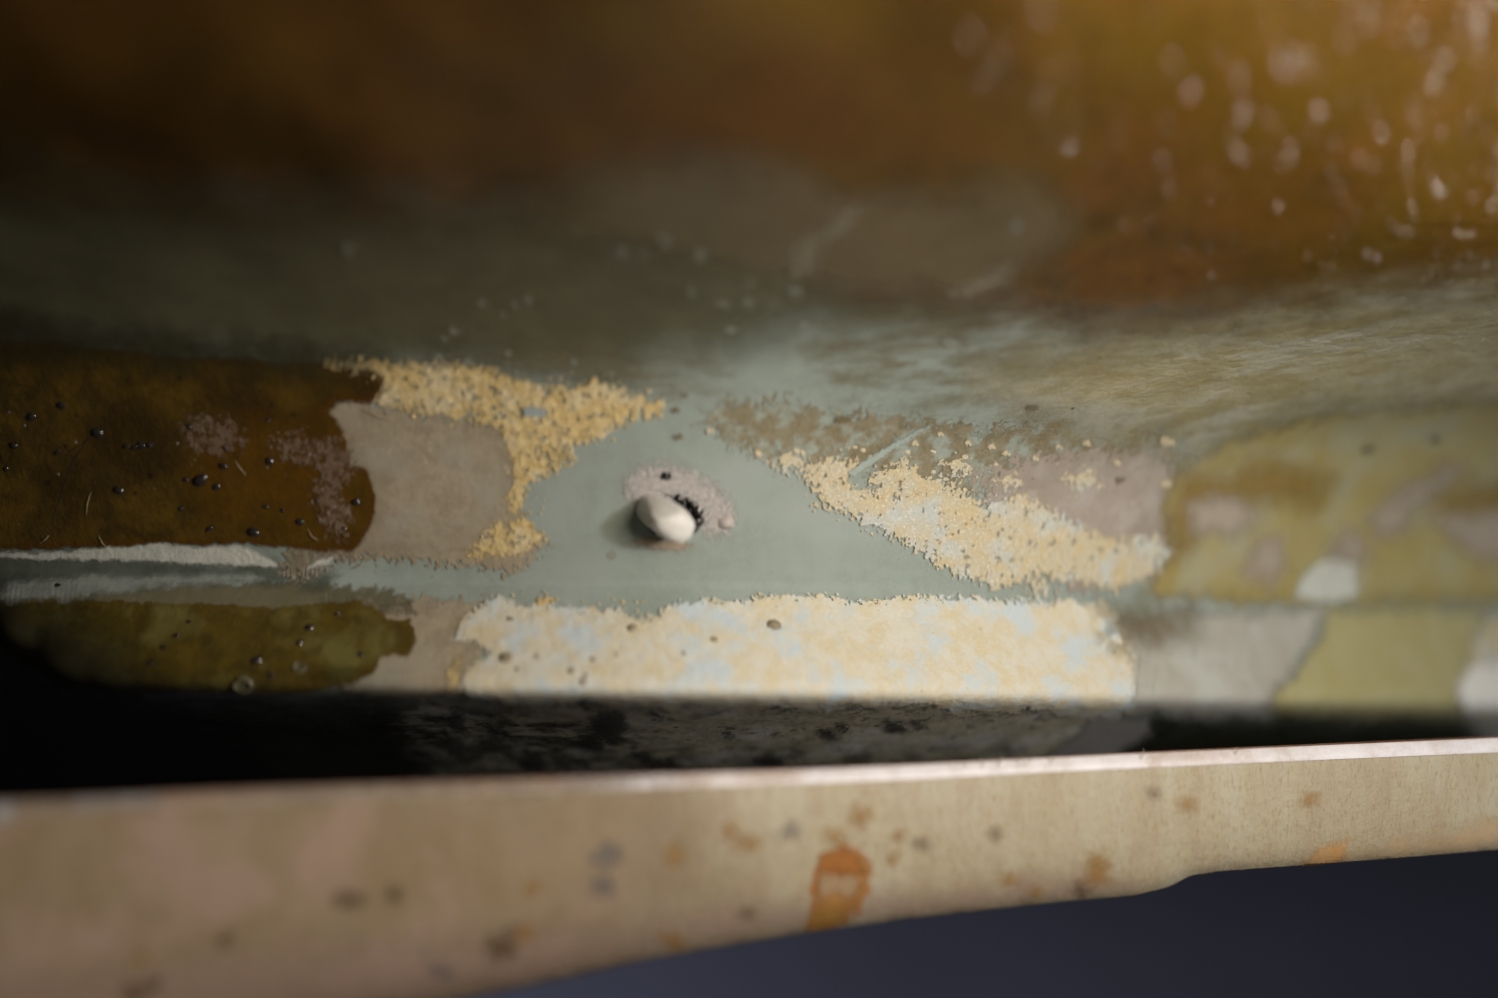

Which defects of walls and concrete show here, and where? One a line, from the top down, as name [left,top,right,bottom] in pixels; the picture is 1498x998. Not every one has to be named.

peeling [322,355,667,562]
water stain [0,583,1480,799]
peeling [444,443,1325,756]
corrosion [807,844,872,933]